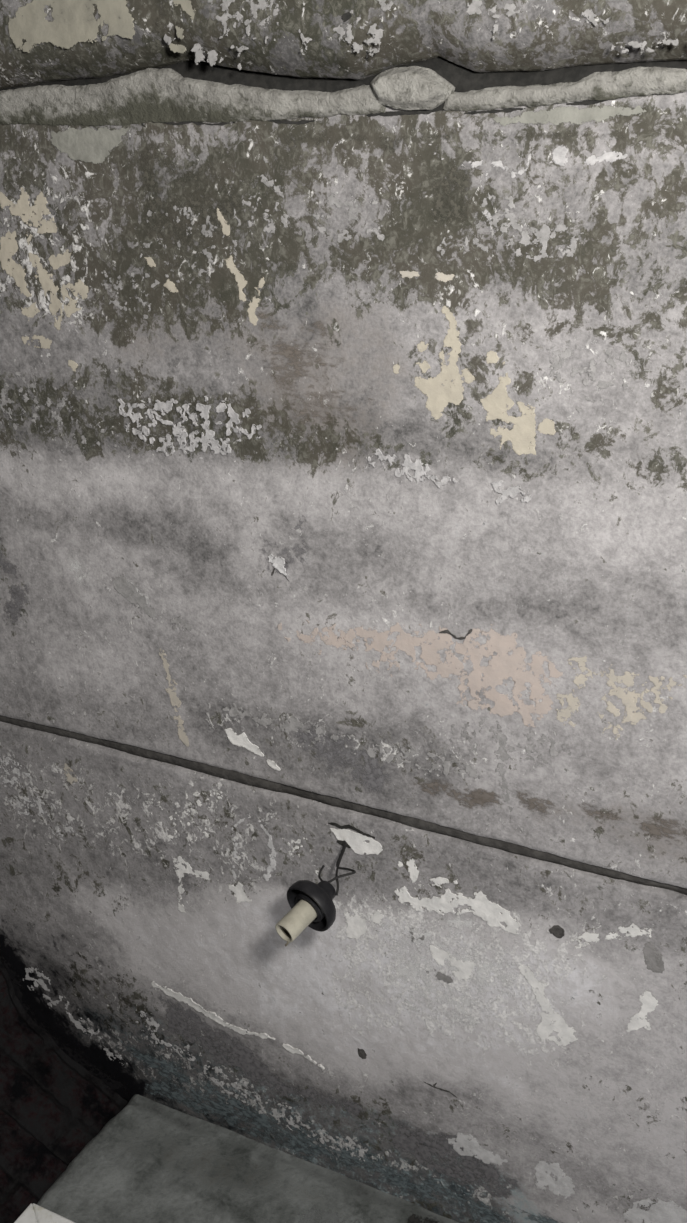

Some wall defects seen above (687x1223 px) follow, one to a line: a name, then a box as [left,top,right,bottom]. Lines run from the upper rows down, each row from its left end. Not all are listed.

peeling [8,0,136,53]
crack [141,120,235,128]
water stain [137,145,240,255]
crack [268,118,315,126]
crack [0,57,687,117]
water stain [381,132,531,224]
water stain [527,132,588,166]
water stain [584,131,627,166]
peeling [0,156,293,349]
peeling [0,371,262,459]
peeling [480,351,556,456]
peeling [394,858,521,934]